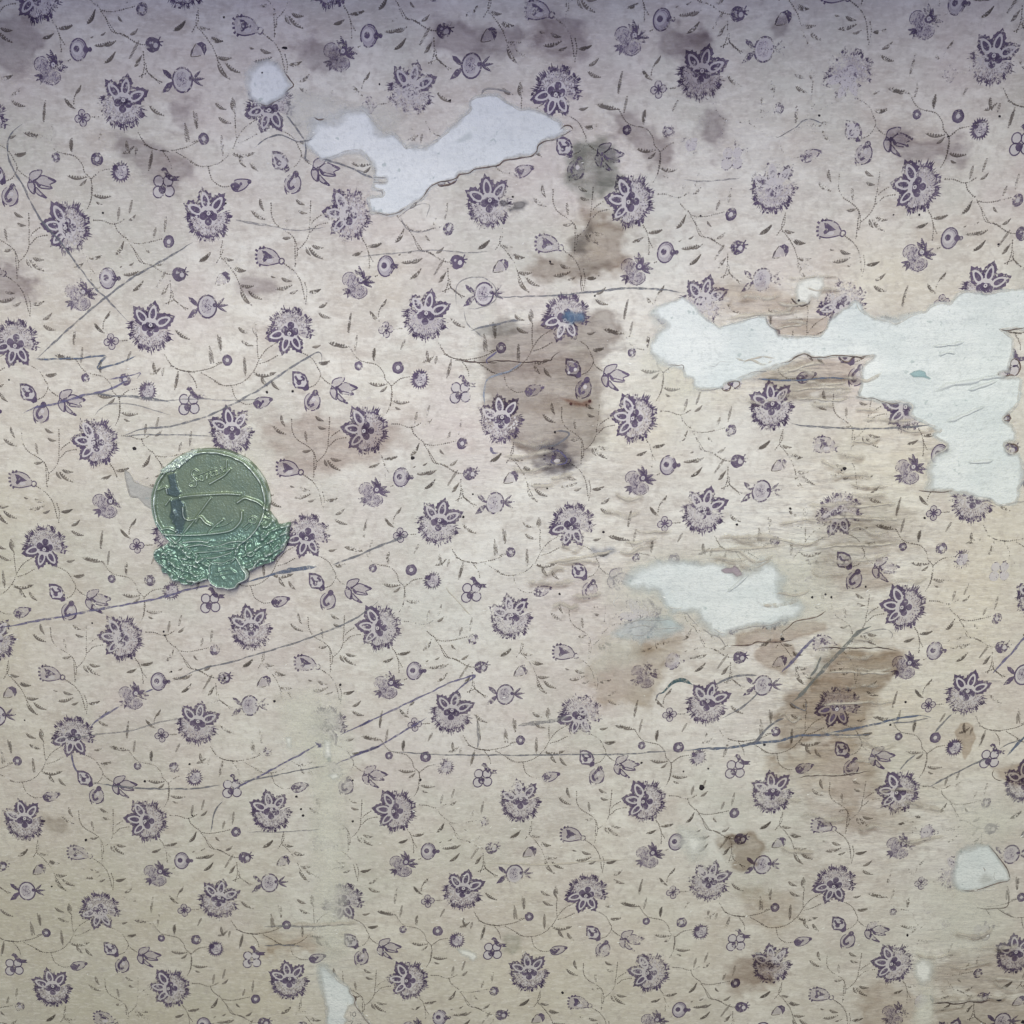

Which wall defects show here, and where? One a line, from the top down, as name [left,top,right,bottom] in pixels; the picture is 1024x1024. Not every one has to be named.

peeling [247,60,294,106]
peeling [305,87,573,216]
peeling [651,289,1024,506]
peeling [625,560,824,646]
peeling [953,845,1010,892]